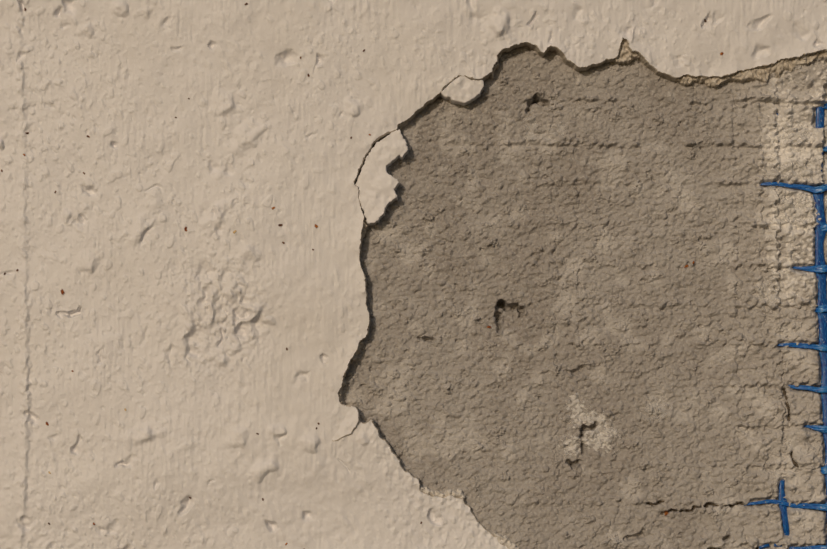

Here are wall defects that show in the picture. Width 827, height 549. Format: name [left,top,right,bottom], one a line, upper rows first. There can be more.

peeling [332,37,827,549]
crack [643,501,744,515]